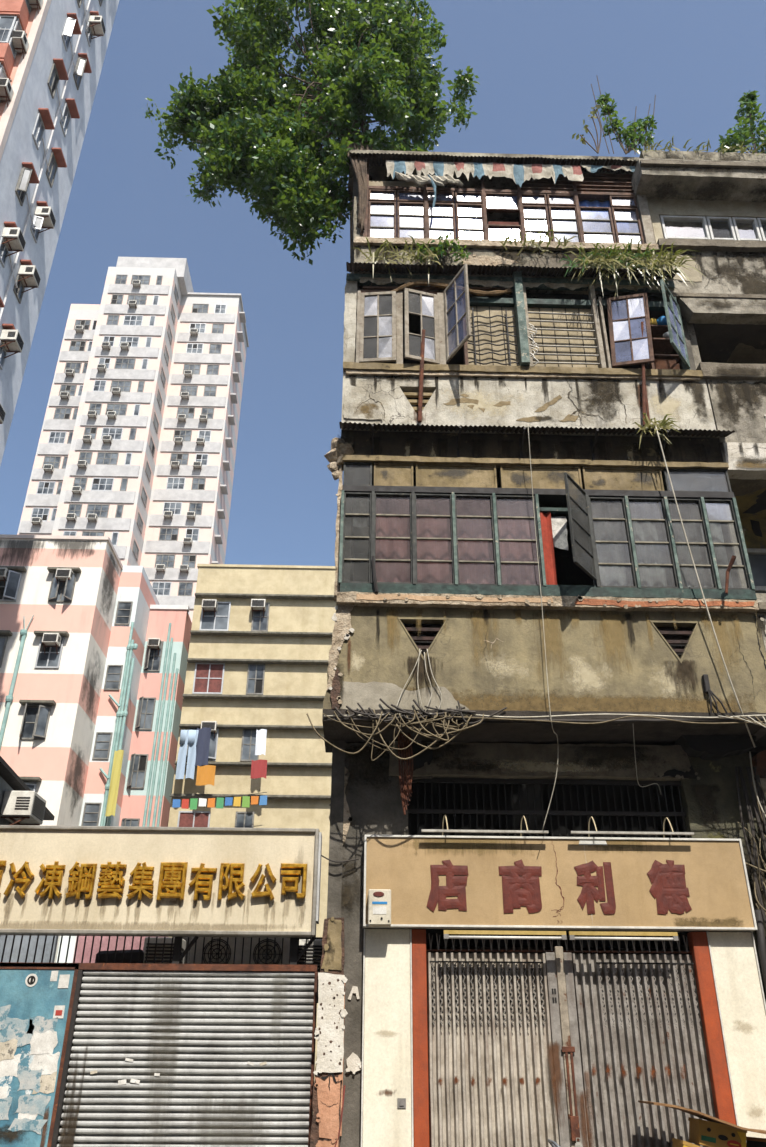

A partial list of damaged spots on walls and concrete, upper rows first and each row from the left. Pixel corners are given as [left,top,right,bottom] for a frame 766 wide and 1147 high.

leakage [652,153,766,201]
leakage [678,252,766,308]
leakage [585,379,622,420]
leakage [688,366,766,422]
leakage [102,554,116,611]
flaking render [572,595,766,634]
spalling [327,593,553,709]
leakage [453,612,752,713]
rust [438,1042,561,1109]
rust [580,1065,685,1147]